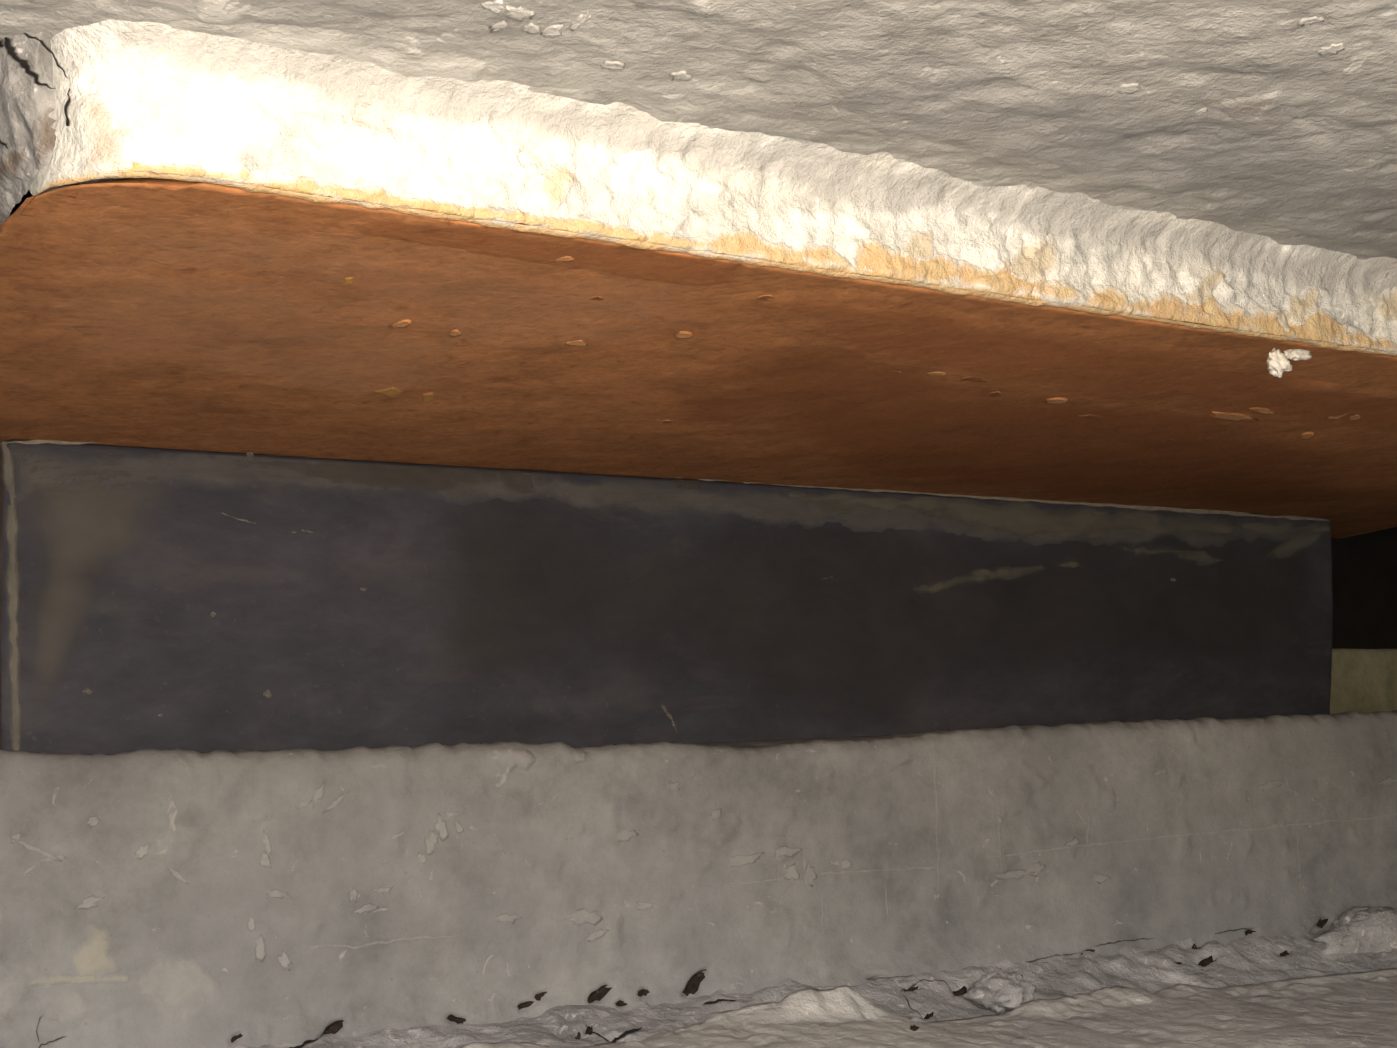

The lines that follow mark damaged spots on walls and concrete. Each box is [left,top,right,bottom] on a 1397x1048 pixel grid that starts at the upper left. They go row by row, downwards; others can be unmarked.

crack [0,33,71,126]
efflorescence [158,76,289,171]
leakage [165,0,490,83]
efflorescence [305,114,543,191]
efflorescence [528,87,616,105]
efflorescence [590,149,733,213]
leakage [805,27,1397,260]
leakage [0,185,755,407]
efflorescence [759,204,876,246]
efflorescence [933,232,1017,270]
efflorescence [1113,261,1249,304]
leakage [13,444,1331,669]